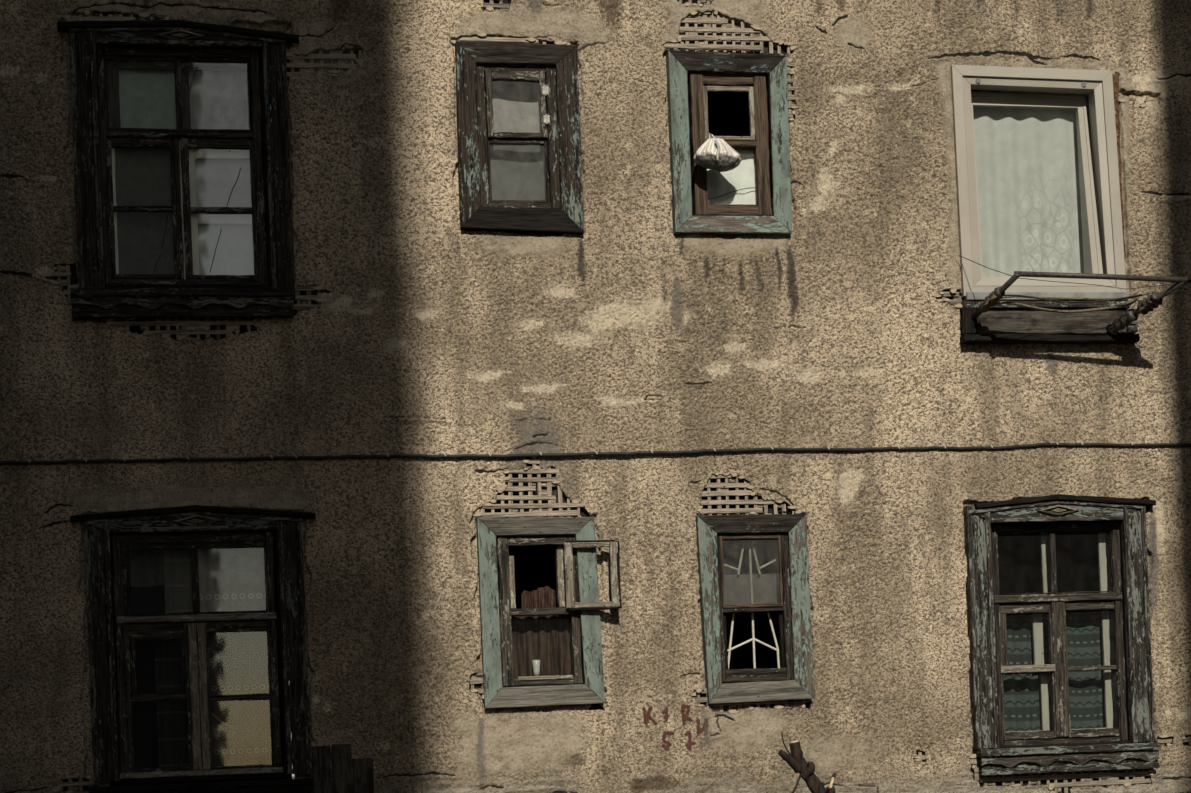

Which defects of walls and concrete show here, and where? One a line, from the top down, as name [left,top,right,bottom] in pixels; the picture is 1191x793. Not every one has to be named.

flaking render [477,0,511,12]
flaking render [663,0,799,122]
crack [876,50,1100,88]
crack [0,172,33,180]
crack [1140,189,1191,197]
crack [0,270,54,280]
leakage [775,248,798,315]
flaking render [473,412,590,519]
flaking render [695,473,802,515]
peeling [382,711,588,793]
flaking render [1156,734,1191,746]
peeling [824,754,1191,793]